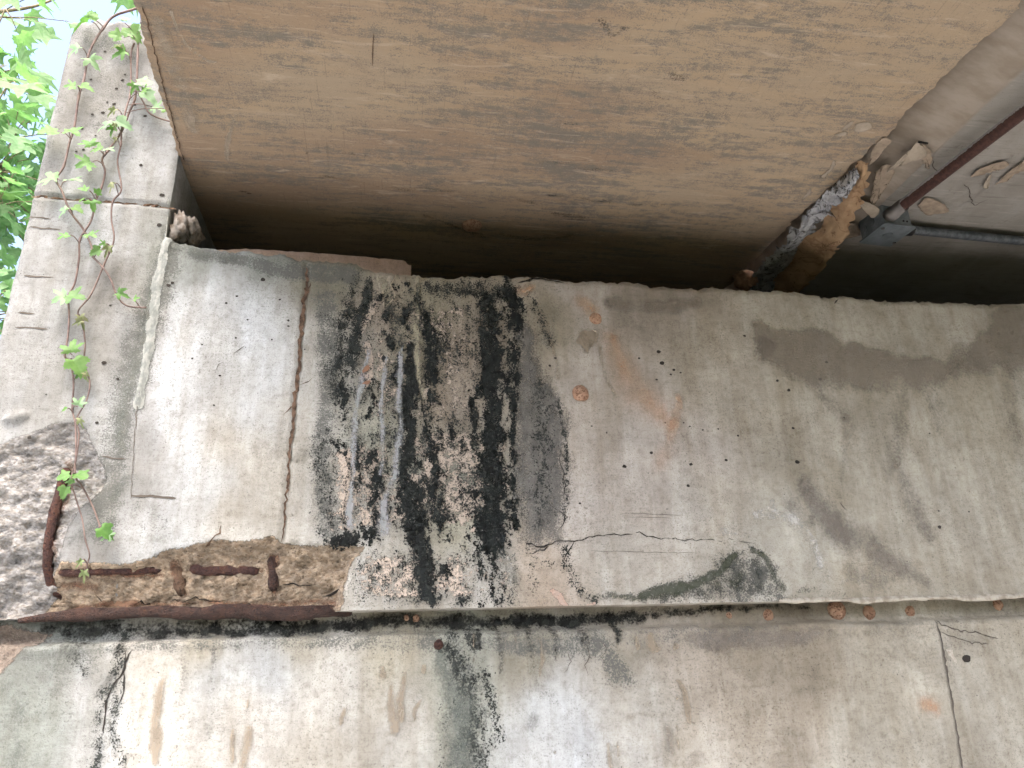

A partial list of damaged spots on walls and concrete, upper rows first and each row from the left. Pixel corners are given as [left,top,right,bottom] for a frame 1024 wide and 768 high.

peeling [860,138,933,218]
peeling [360,299,467,417]
leakage [754,308,1024,390]
corrosion [60,560,338,609]
spalling [0,422,511,674]
leakage [40,270,821,768]
crack [525,449,753,559]
crack [935,620,998,768]